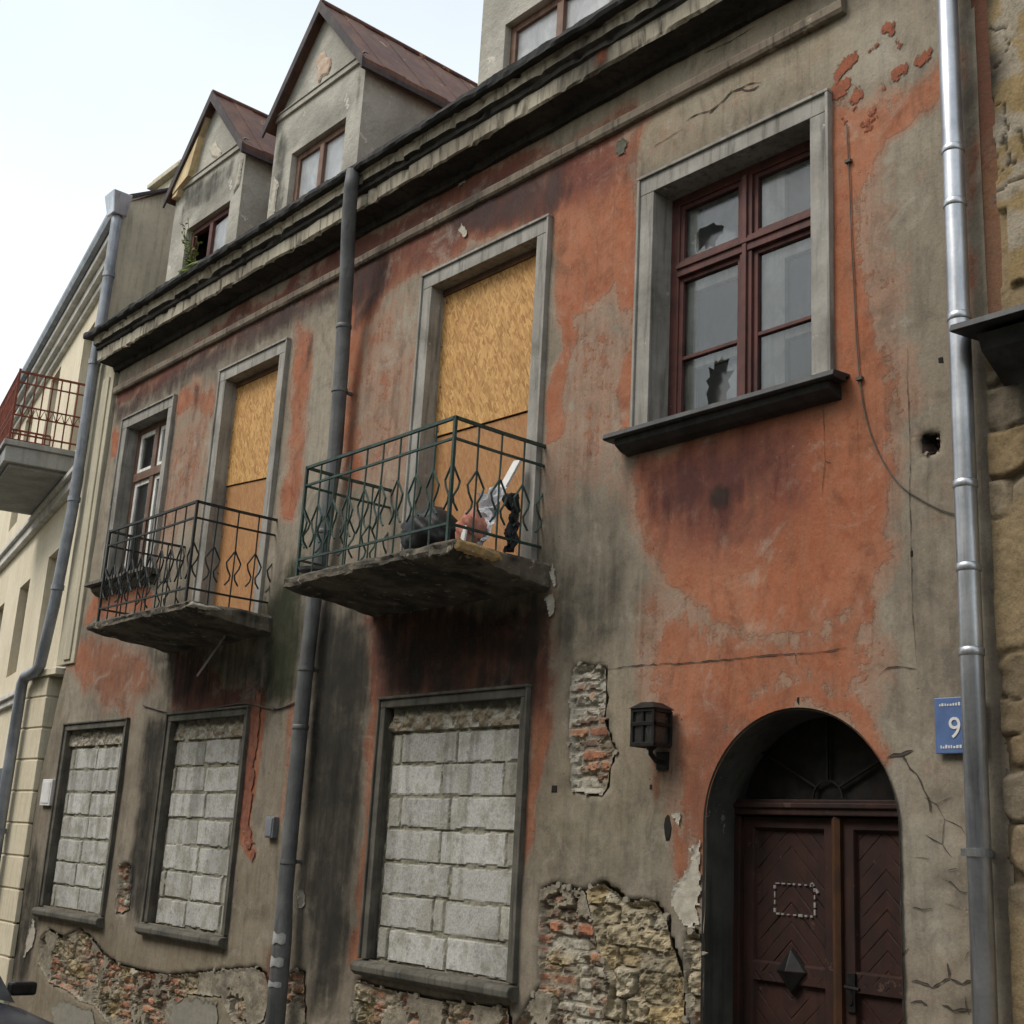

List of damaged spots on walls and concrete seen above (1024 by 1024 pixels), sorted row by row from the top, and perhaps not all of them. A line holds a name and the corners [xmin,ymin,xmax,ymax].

crack [656,82,758,145]
peeling [830,21,903,132]
damp [381,583,574,694]
peeling [544,564,556,616]
crack [613,648,839,669]
flaking render [566,661,619,796]
damp [308,607,368,999]
spalling [664,812,681,841]
crack [887,750,967,910]
flaking render [23,919,268,1024]
flaking render [349,840,708,1024]
crack [911,951,972,1014]